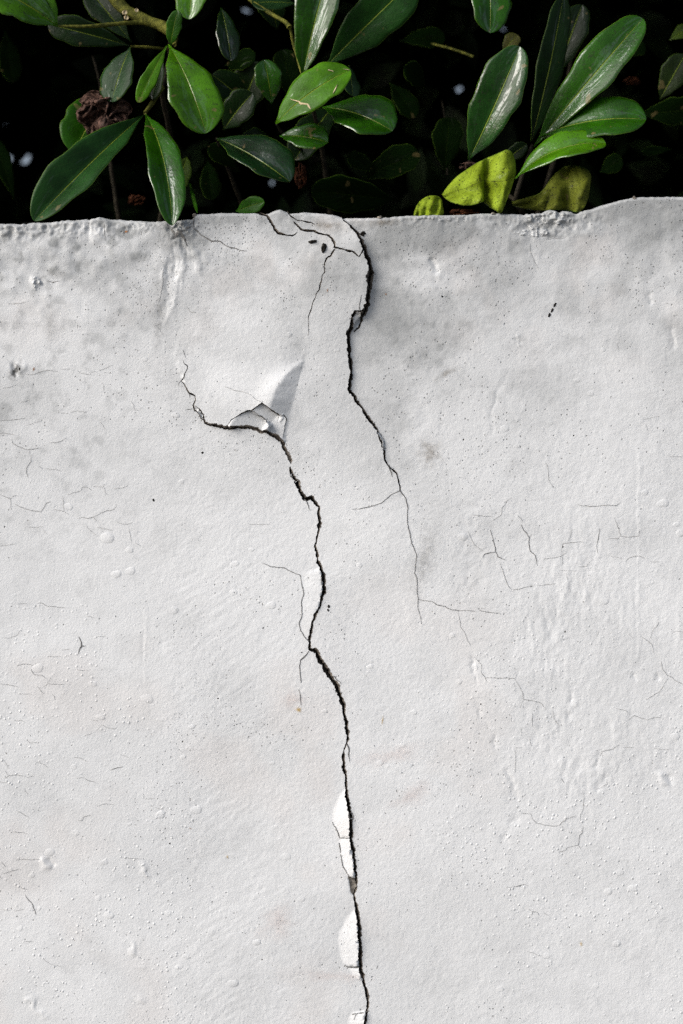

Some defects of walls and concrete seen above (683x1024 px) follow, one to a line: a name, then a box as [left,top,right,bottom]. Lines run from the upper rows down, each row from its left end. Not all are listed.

crack [171,218,244,251]
spalling [229,402,286,437]
crack [259,211,558,771]
crack [178,351,370,1024]
peeling [331,791,356,894]
peeling [338,911,361,980]
peeling [347,1012,365,1024]